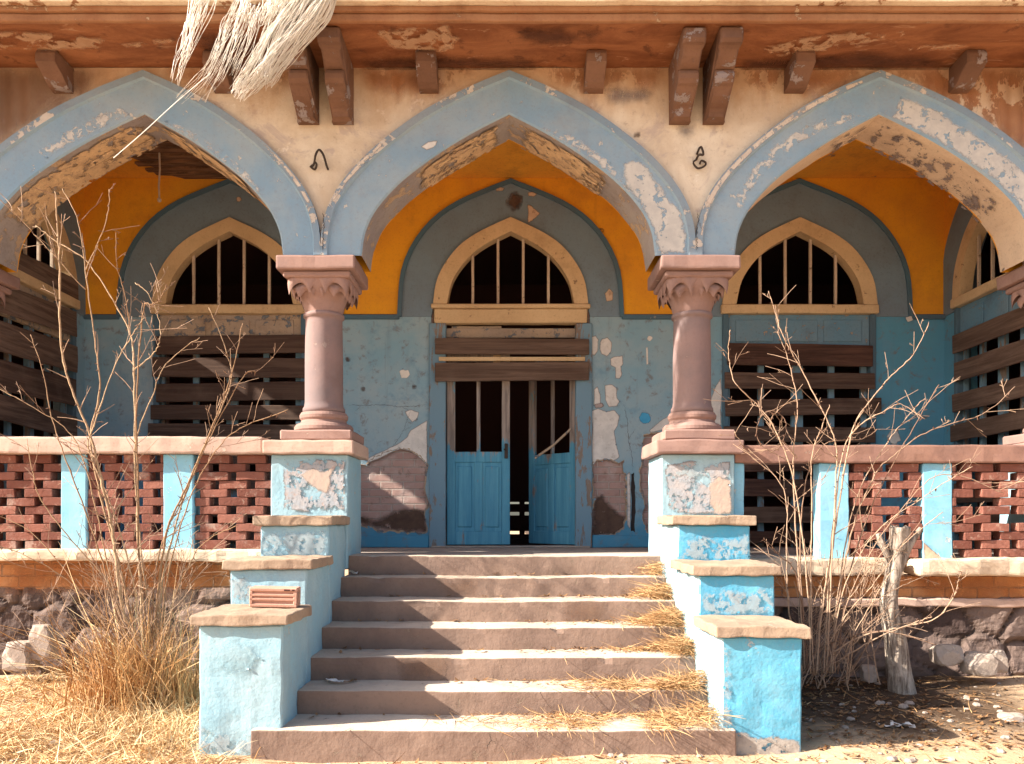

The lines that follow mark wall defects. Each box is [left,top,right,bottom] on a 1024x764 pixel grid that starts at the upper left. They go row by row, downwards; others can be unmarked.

flaking render [4,109,261,232]
flaking render [419,126,500,189]
peeling [520,127,686,253]
peeling [701,81,1024,235]
flaking render [592,335,669,535]
peeling [283,458,346,512]
flaking render [361,410,429,535]
peeling [664,461,731,515]
peeling [261,532,326,556]
peeling [683,535,750,559]
peeling [703,588,774,615]